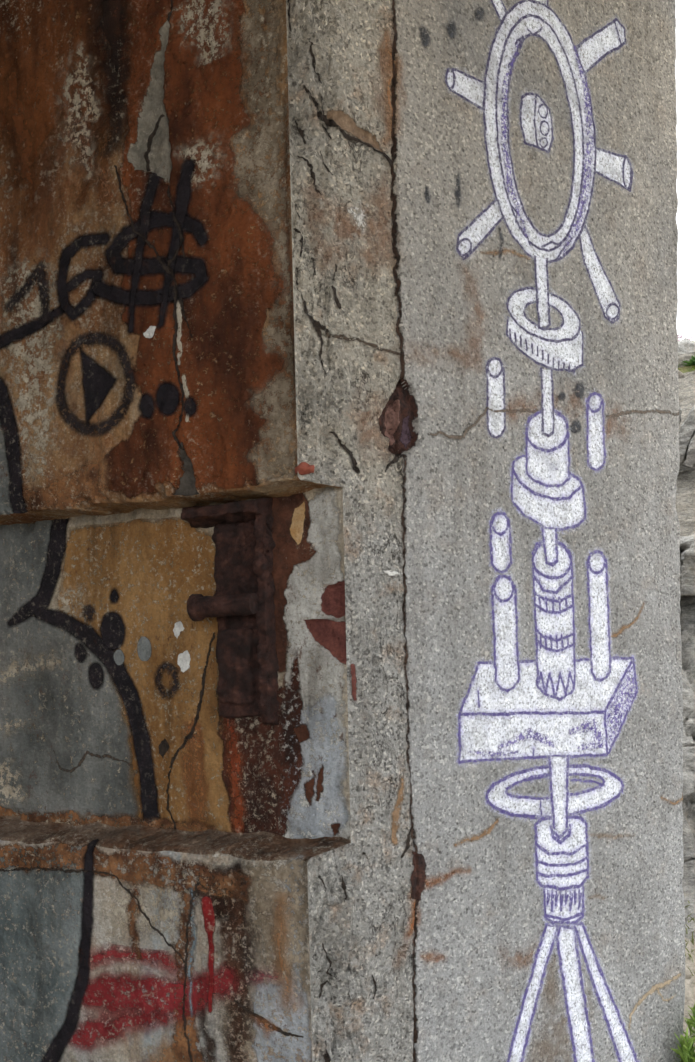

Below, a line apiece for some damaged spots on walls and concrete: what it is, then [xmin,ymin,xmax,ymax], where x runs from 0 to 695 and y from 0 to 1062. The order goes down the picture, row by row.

rust [0,0,286,502]
spalling [127,20,172,184]
flaking render [233,0,316,480]
crack [330,432,360,474]
crack [303,0,405,386]
spalling [379,378,418,454]
rust [0,492,317,837]
flaking render [279,487,357,839]
crack [385,453,418,858]
rust [0,840,253,1062]
flaking render [243,857,335,1062]
crack [411,898,419,1062]